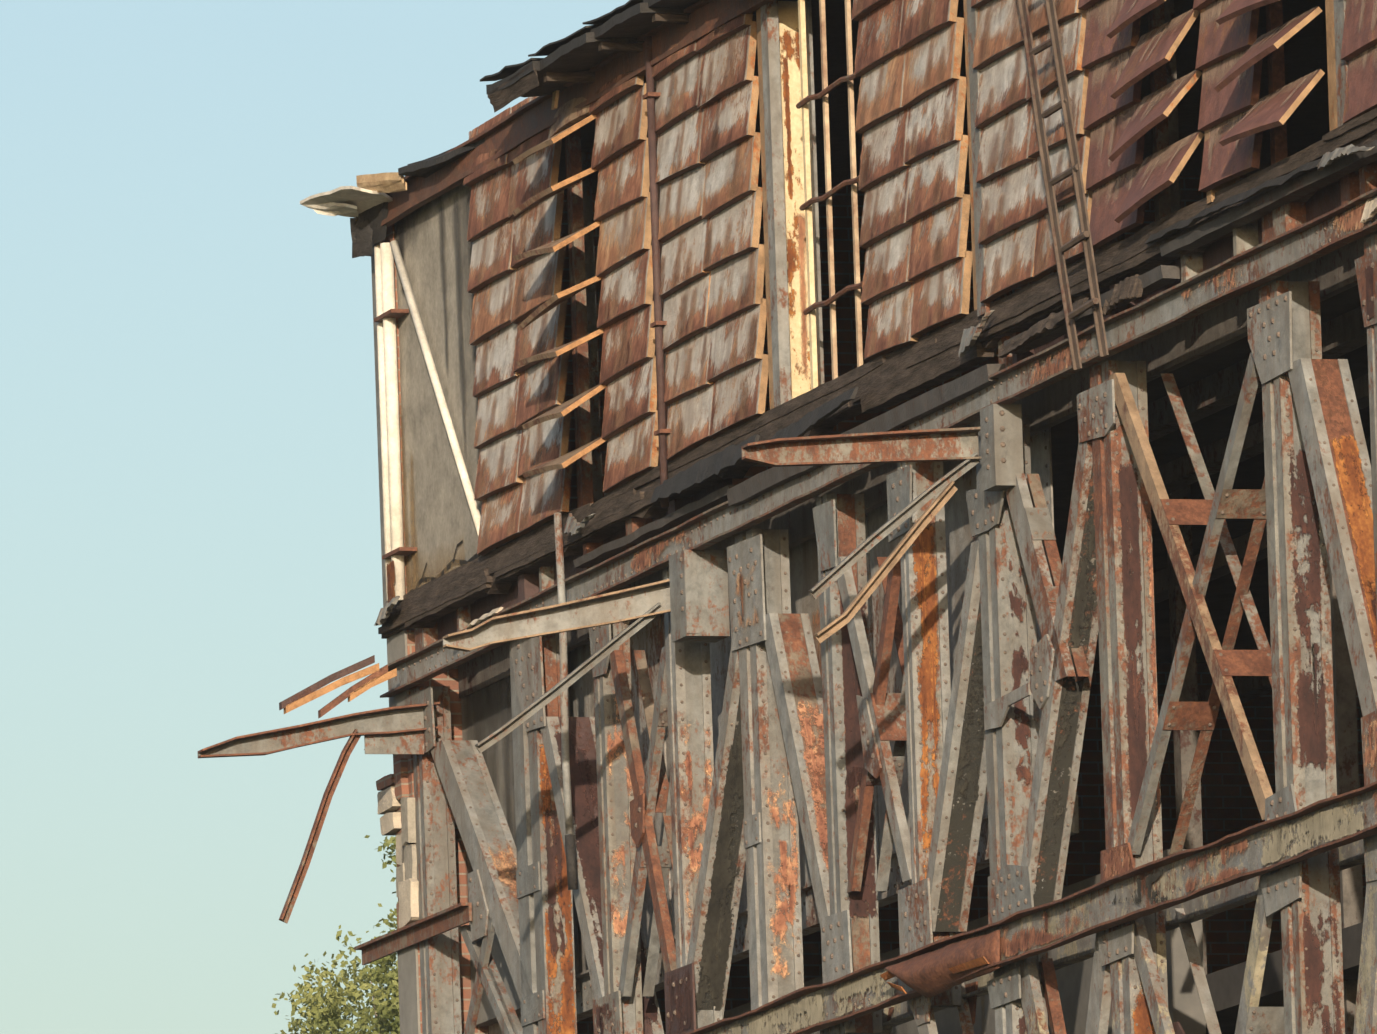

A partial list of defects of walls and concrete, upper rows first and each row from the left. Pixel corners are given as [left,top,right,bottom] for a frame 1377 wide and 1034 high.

rust [779,28,811,389]
rust [539,695,692,1034]
rust [681,725,712,873]
rust [767,776,799,978]
rust [798,702,829,869]
rust [812,611,822,676]
rust [839,586,878,918]
rust [912,523,940,879]
rust [1288,447,1328,771]
rust [1332,435,1377,648]
rust [1132,992,1155,1034]